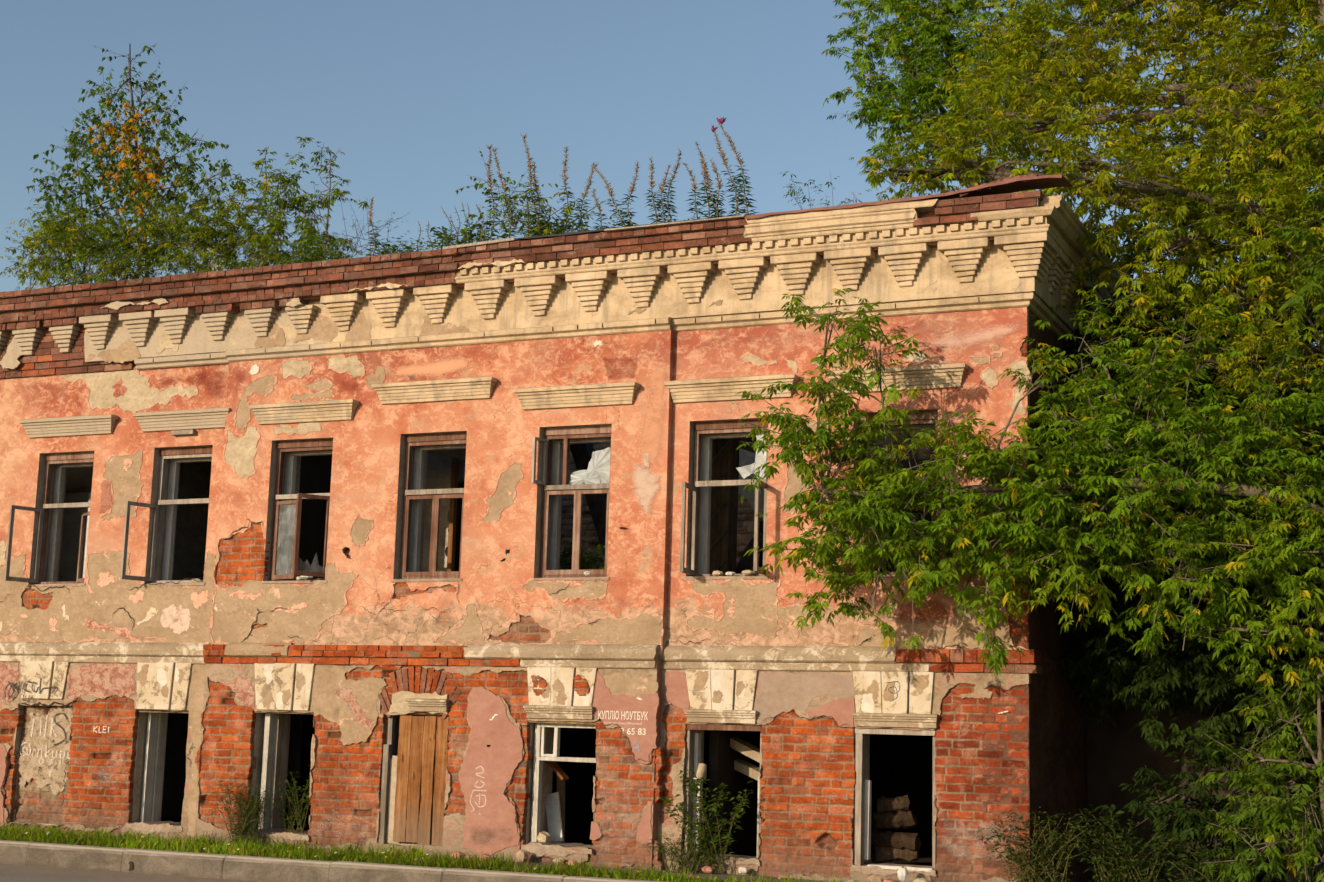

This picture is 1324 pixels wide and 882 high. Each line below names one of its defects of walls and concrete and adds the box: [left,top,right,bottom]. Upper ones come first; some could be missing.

flaking render [0,218,751,479]
peeling [100,449,143,521]
peeling [482,461,524,522]
peeling [0,514,687,871]
flaking render [753,671,856,879]
flaking render [854,575,1042,882]